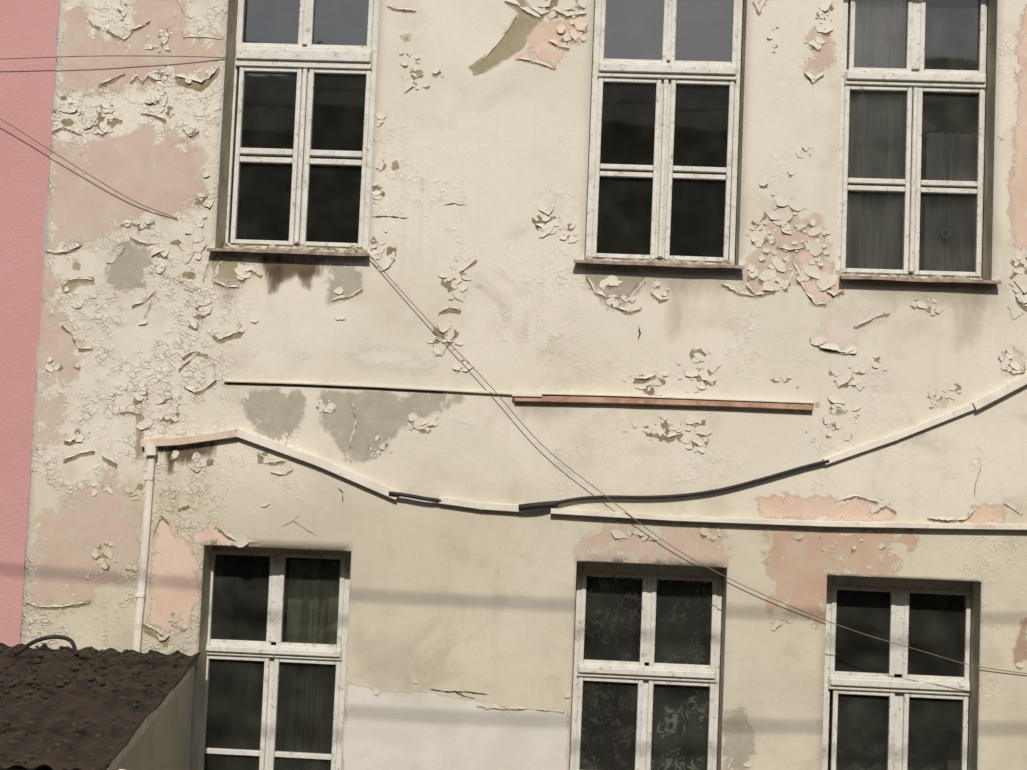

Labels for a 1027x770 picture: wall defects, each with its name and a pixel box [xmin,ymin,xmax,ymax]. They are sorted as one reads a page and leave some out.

peeling [469,0,588,76]
peeling [999,4,1027,320]
peeling [25,0,263,647]
peeling [327,263,363,320]
peeling [427,258,477,373]
peeling [721,177,893,442]
peeling [622,347,721,396]
peeling [243,388,462,462]
peeling [622,411,712,453]
peeling [574,519,727,563]
peeling [755,493,918,630]
peeling [927,502,1022,524]